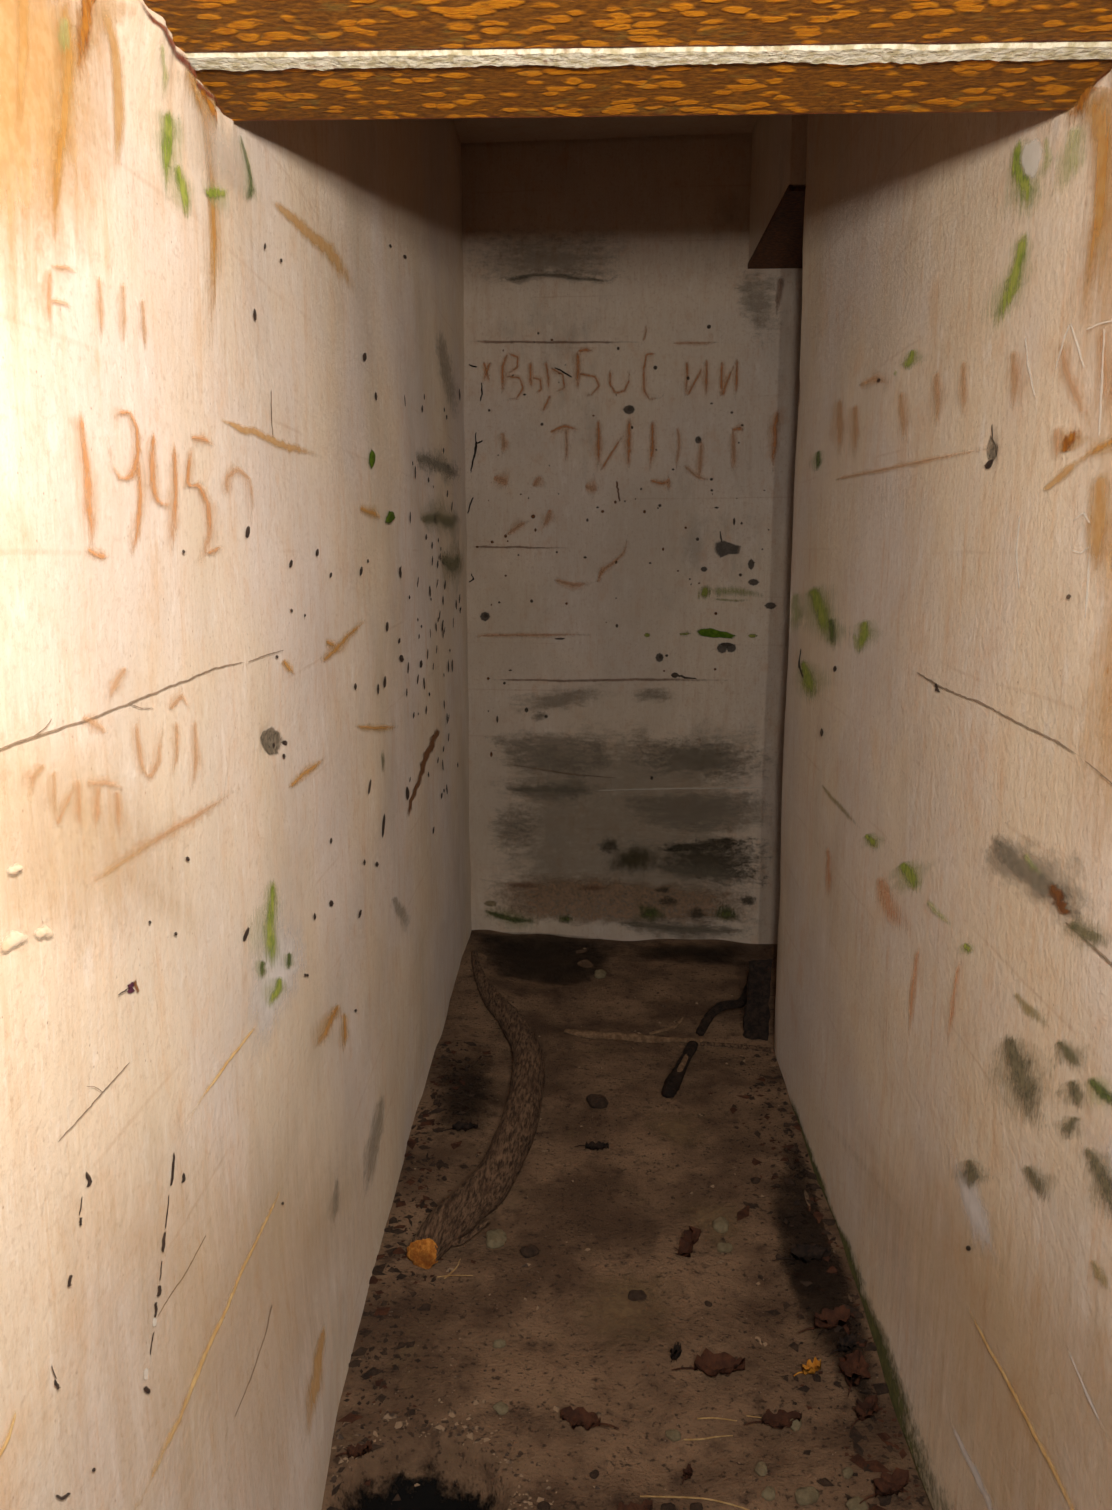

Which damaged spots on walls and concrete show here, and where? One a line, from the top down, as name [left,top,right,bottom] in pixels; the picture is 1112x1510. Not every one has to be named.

damp [601,838,759,879]